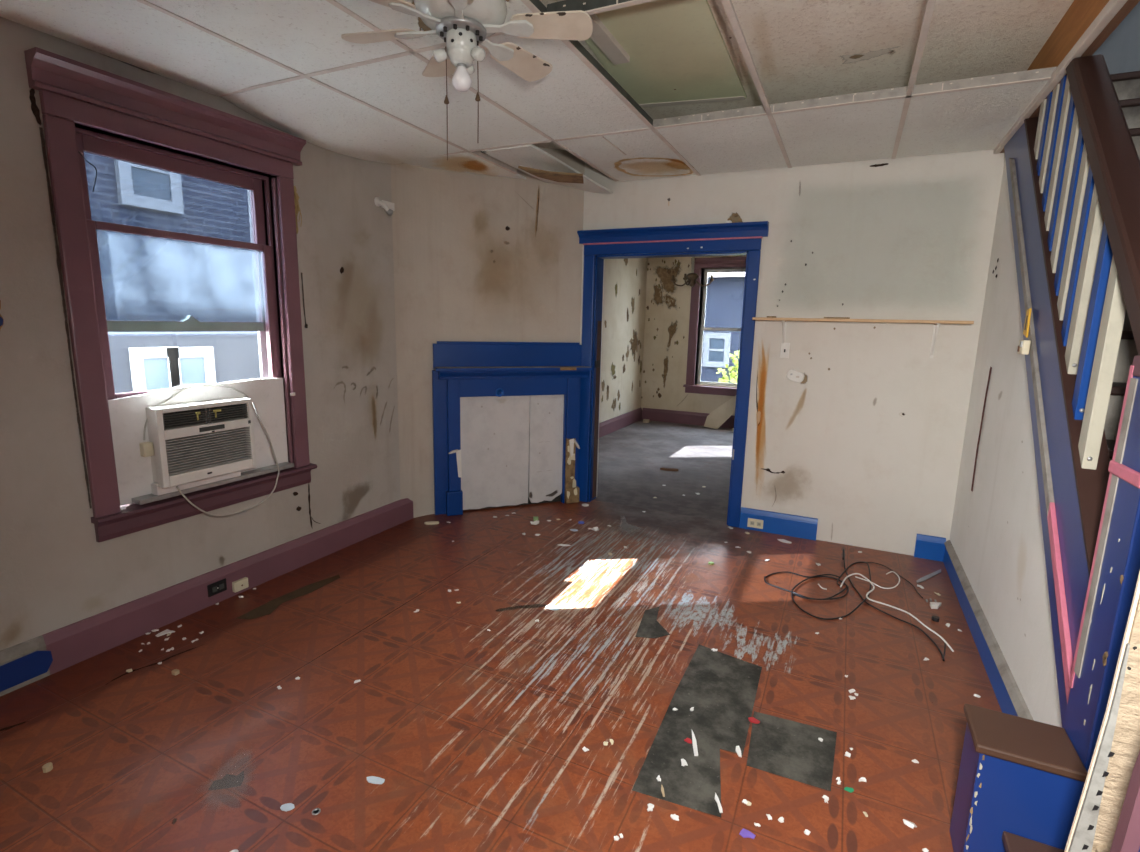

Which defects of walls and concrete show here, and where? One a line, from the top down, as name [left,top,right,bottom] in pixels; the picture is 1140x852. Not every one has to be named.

peeling [601,258,642,410]
peeling [635,606,670,638]
peeling [632,644,837,818]